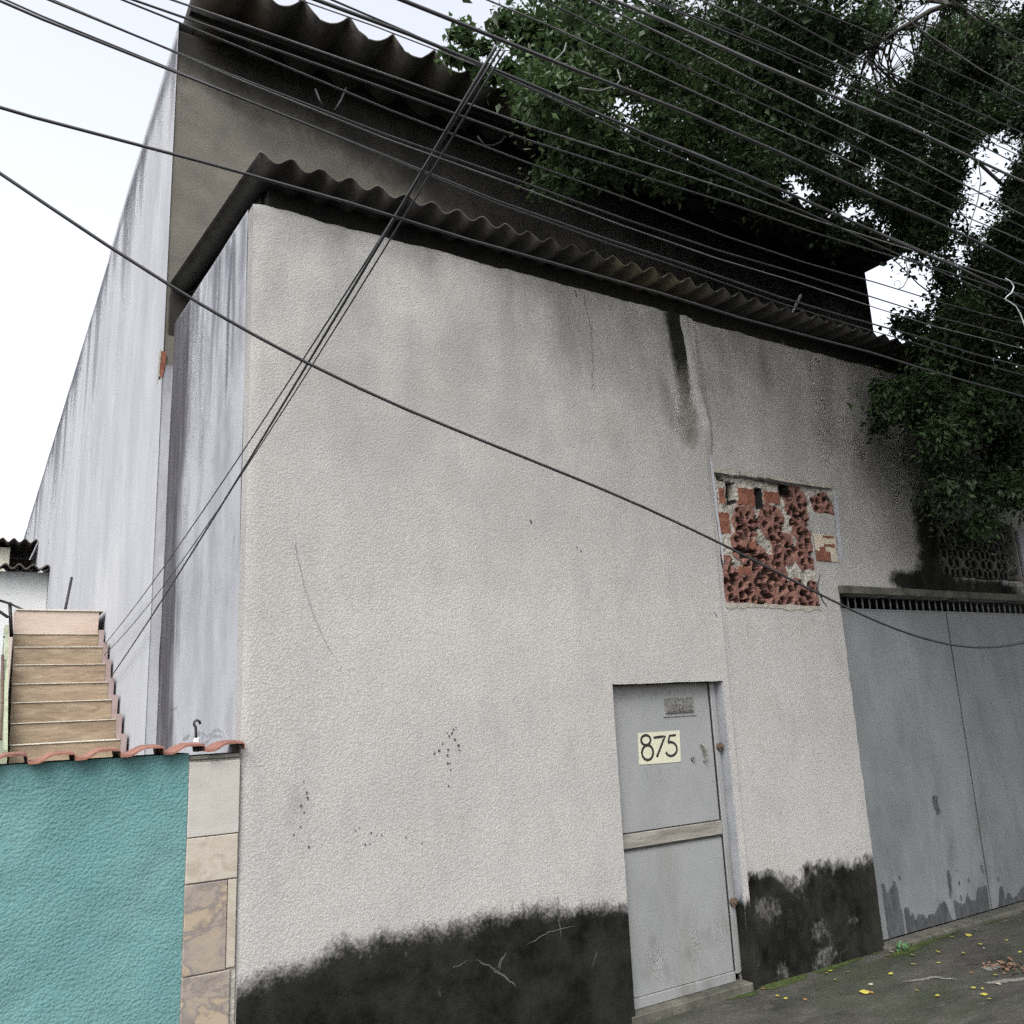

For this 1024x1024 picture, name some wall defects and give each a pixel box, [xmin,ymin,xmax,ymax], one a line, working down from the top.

water stain [666,311,689,405]
spalling [710,459,842,564]
spalling [715,603,822,616]
water stain [236,904,635,1024]
water stain [736,856,884,990]